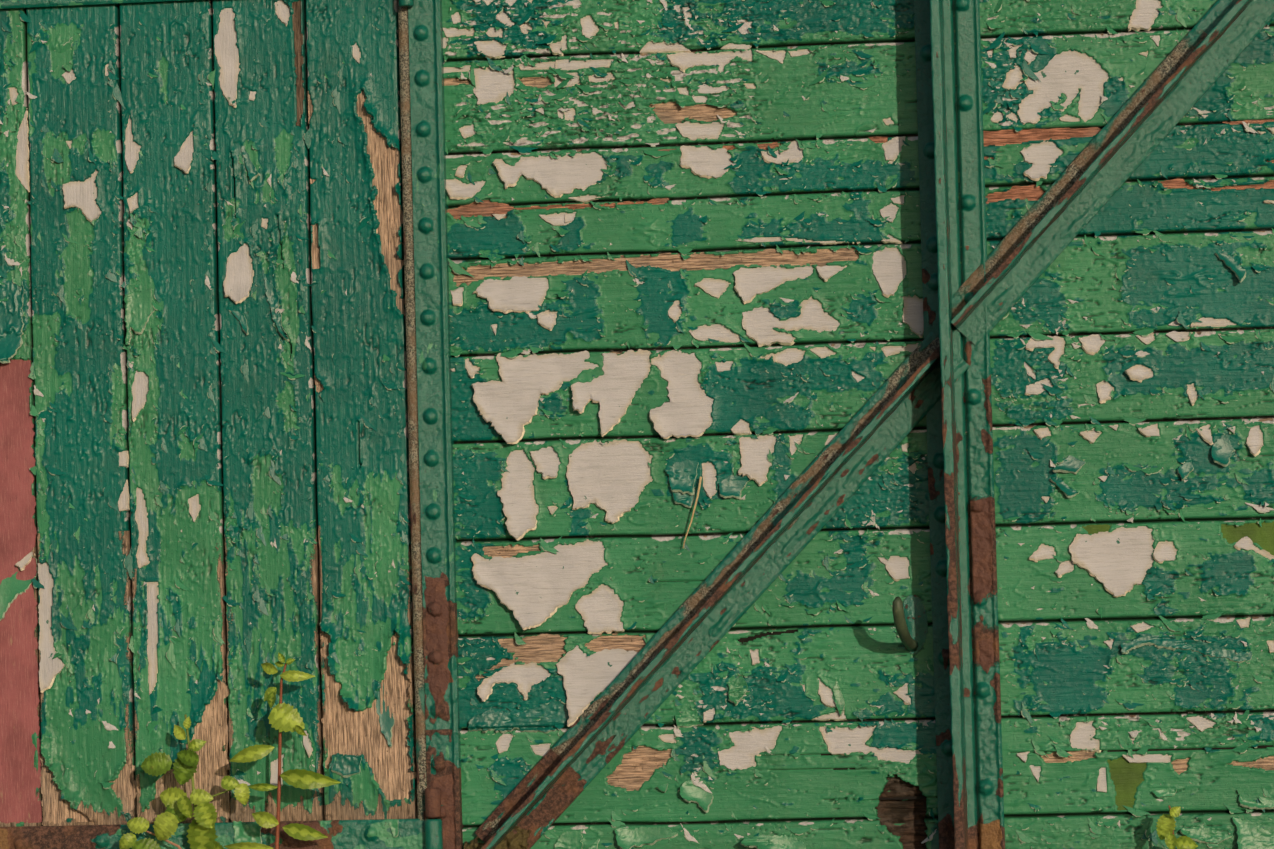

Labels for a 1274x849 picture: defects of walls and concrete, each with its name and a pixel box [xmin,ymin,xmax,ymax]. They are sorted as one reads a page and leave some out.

peeling [981,0,1197,249]
peeling [0,0,417,844]
corrosion [424,576,450,704]
peeling [443,0,937,849]
corrosion [969,497,993,604]
peeling [993,61,1274,849]
corrosion [430,773,456,849]
corrosion [977,819,1003,849]